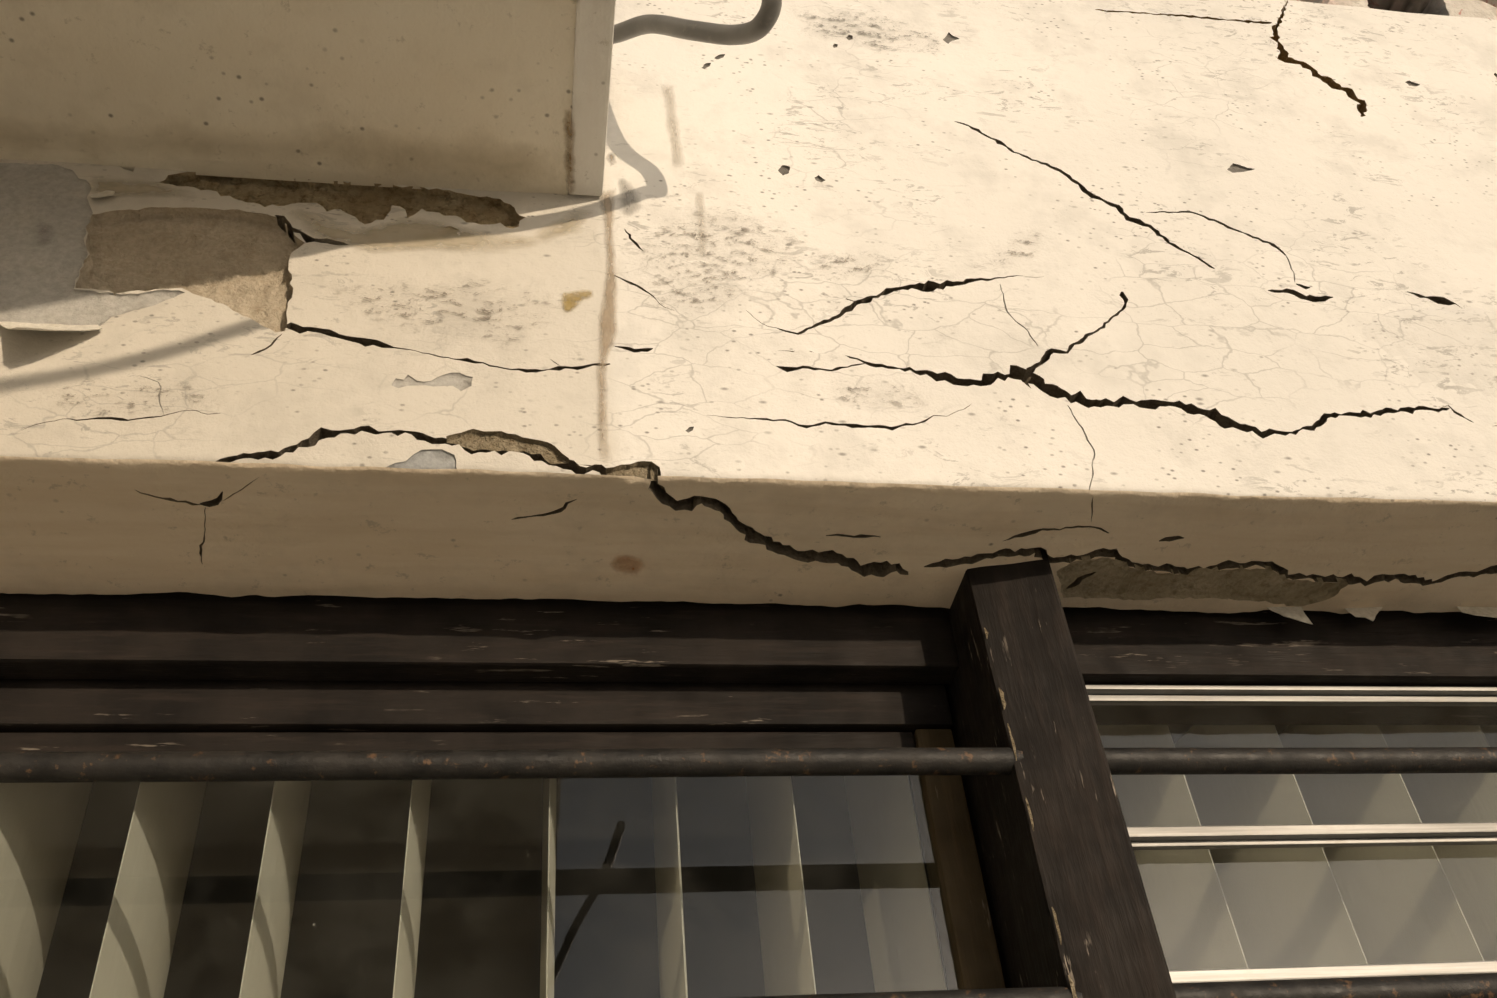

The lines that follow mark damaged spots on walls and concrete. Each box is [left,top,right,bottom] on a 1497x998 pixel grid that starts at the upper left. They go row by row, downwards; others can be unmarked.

crack [1095,0,1367,117]
spalling [0,163,525,333]
crack [614,230,672,310]
crack [954,121,1333,302]
crack [136,275,1497,589]
peeling [1457,606,1497,618]